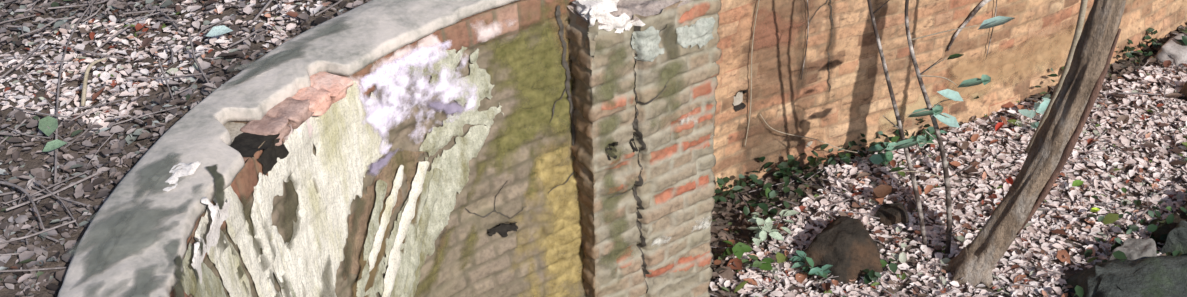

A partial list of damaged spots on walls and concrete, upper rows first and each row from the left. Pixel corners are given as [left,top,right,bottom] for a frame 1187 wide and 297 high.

damp [348,34,442,93]
peeling [589,7,715,62]
peeling [150,161,230,297]
peeling [230,46,504,297]
crack [611,25,669,293]